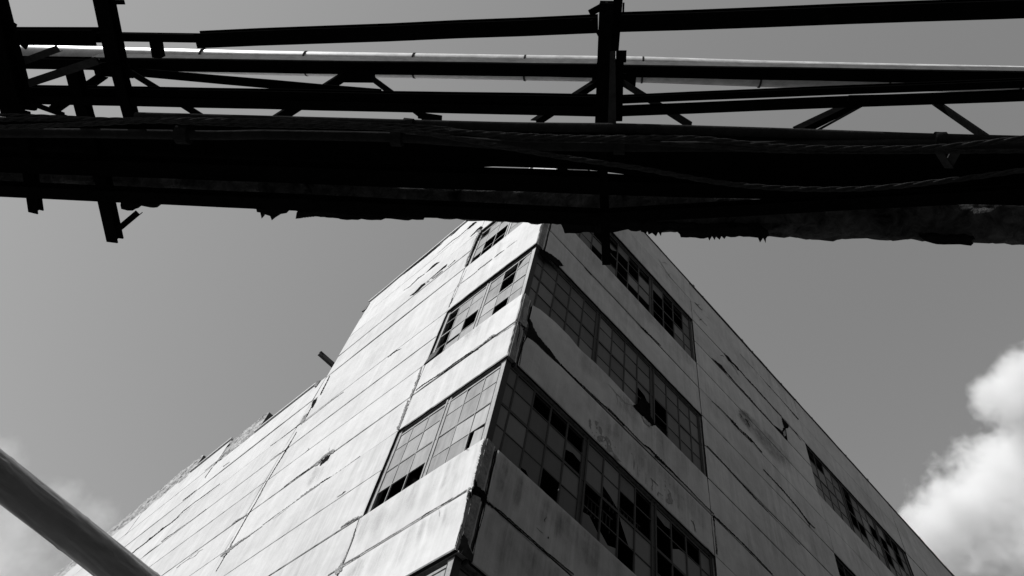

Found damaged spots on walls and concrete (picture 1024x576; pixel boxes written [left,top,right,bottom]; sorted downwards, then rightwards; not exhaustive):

spalling [774,417,801,441]
spalling [284,449,334,487]